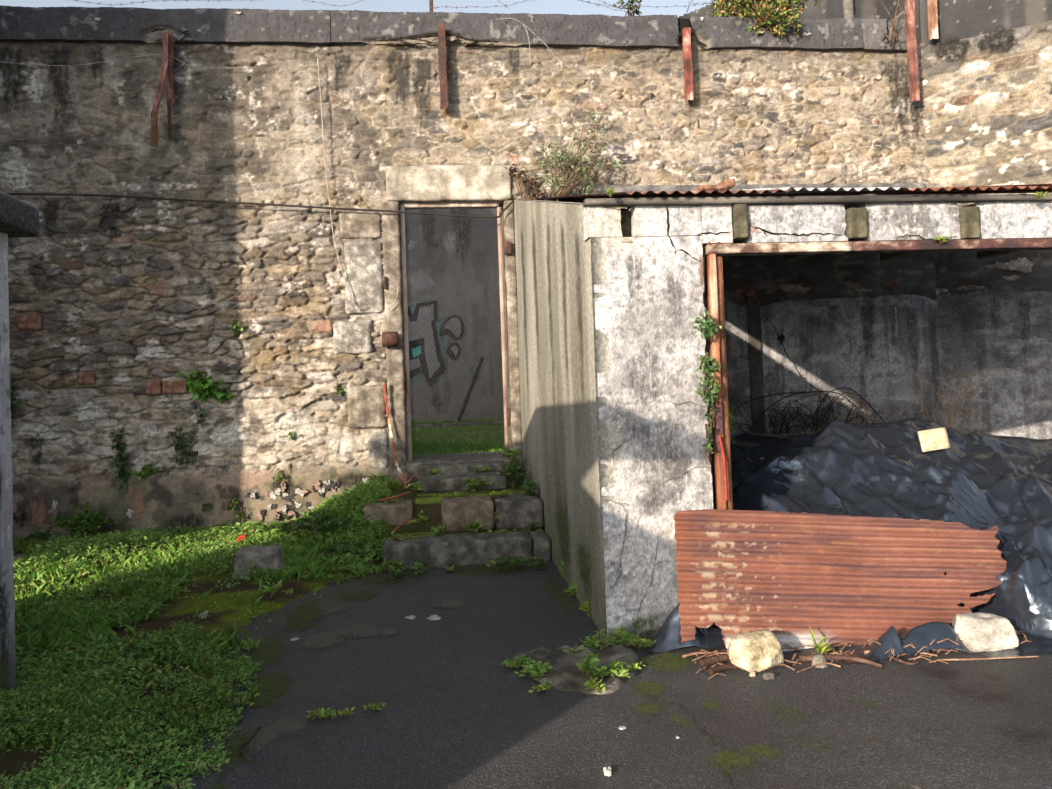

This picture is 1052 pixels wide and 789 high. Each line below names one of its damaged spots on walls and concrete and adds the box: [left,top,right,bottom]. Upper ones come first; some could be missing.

damp [0,46,69,116]
efflorescence [0,157,33,192]
crack [666,207,848,261]
damp [0,578,9,666]
crack [609,500,628,587]
crack [637,536,671,622]